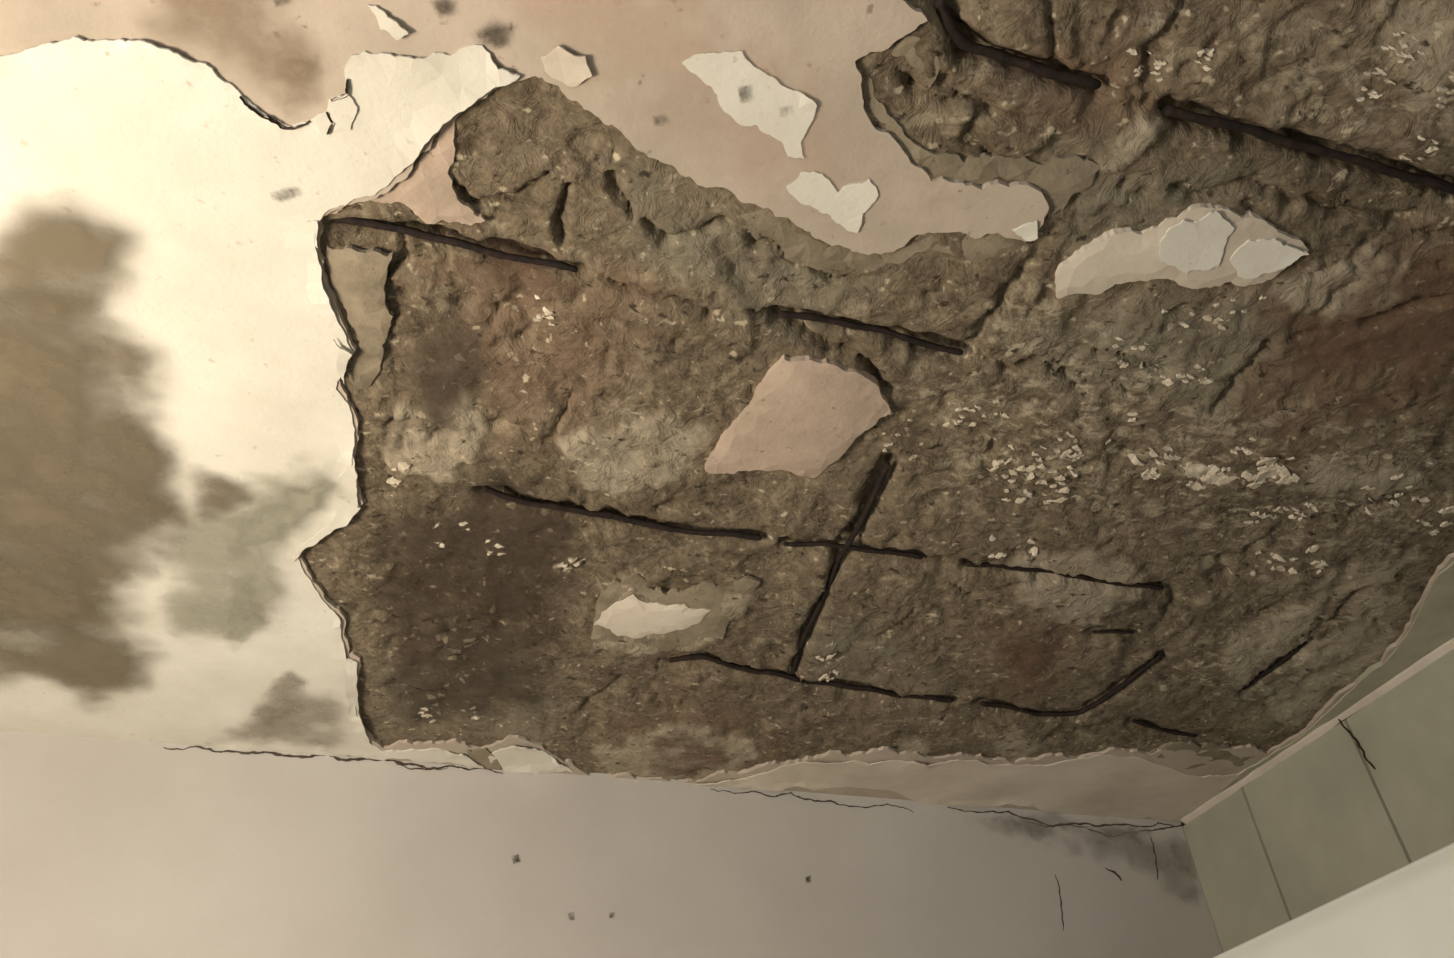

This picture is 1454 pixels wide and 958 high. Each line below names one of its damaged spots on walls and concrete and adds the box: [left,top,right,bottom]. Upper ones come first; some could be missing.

leakage [434,1,449,15]
leakage [477,27,504,47]
peeling [0,36,574,775]
spalling [302,0,1454,780]
leakage [0,214,327,694]
leakage [240,674,333,745]
crack [164,746,503,774]